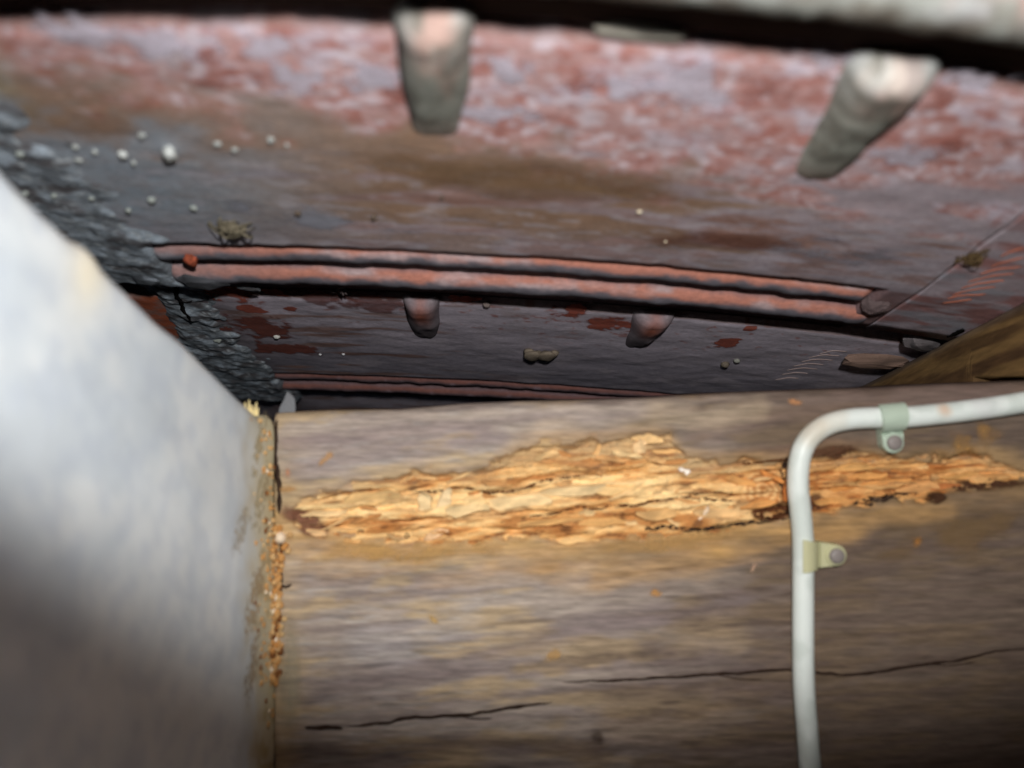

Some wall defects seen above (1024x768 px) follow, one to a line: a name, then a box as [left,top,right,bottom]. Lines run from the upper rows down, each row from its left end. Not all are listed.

peeling [302,433,788,541]
peeling [832,463,978,493]
crack [568,648,1024,683]
crack [304,702,552,730]